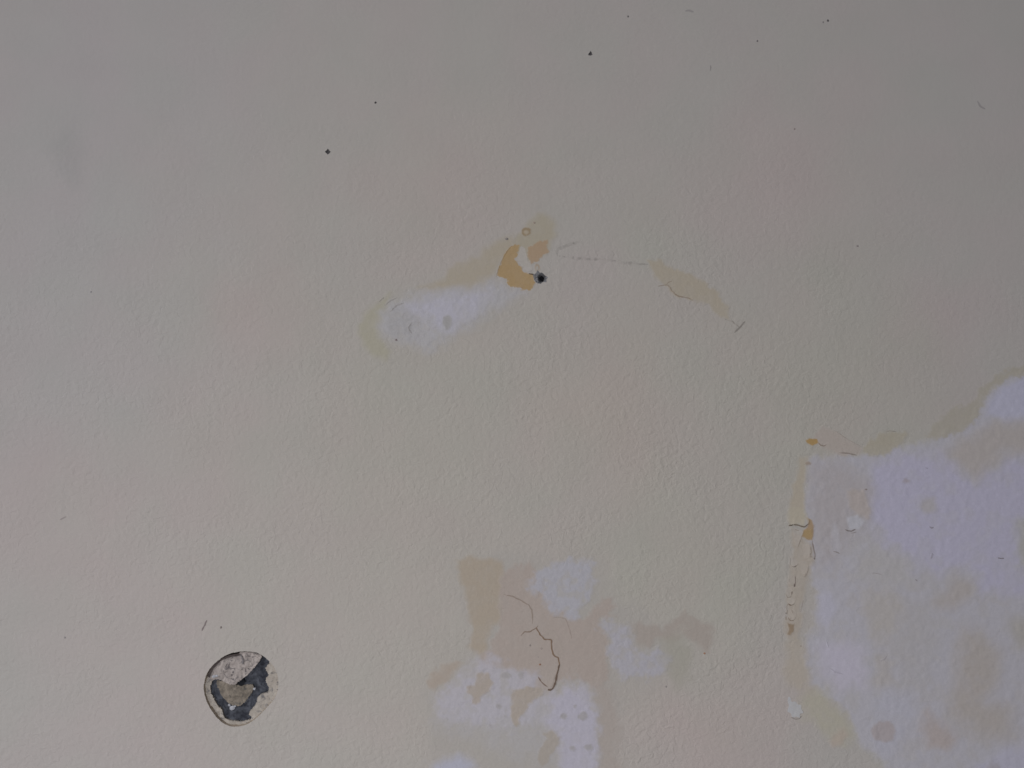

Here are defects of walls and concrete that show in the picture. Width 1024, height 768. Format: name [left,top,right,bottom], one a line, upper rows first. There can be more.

peeling [496,227,550,291]
crack [504,594,572,691]
spalling [204,651,278,727]